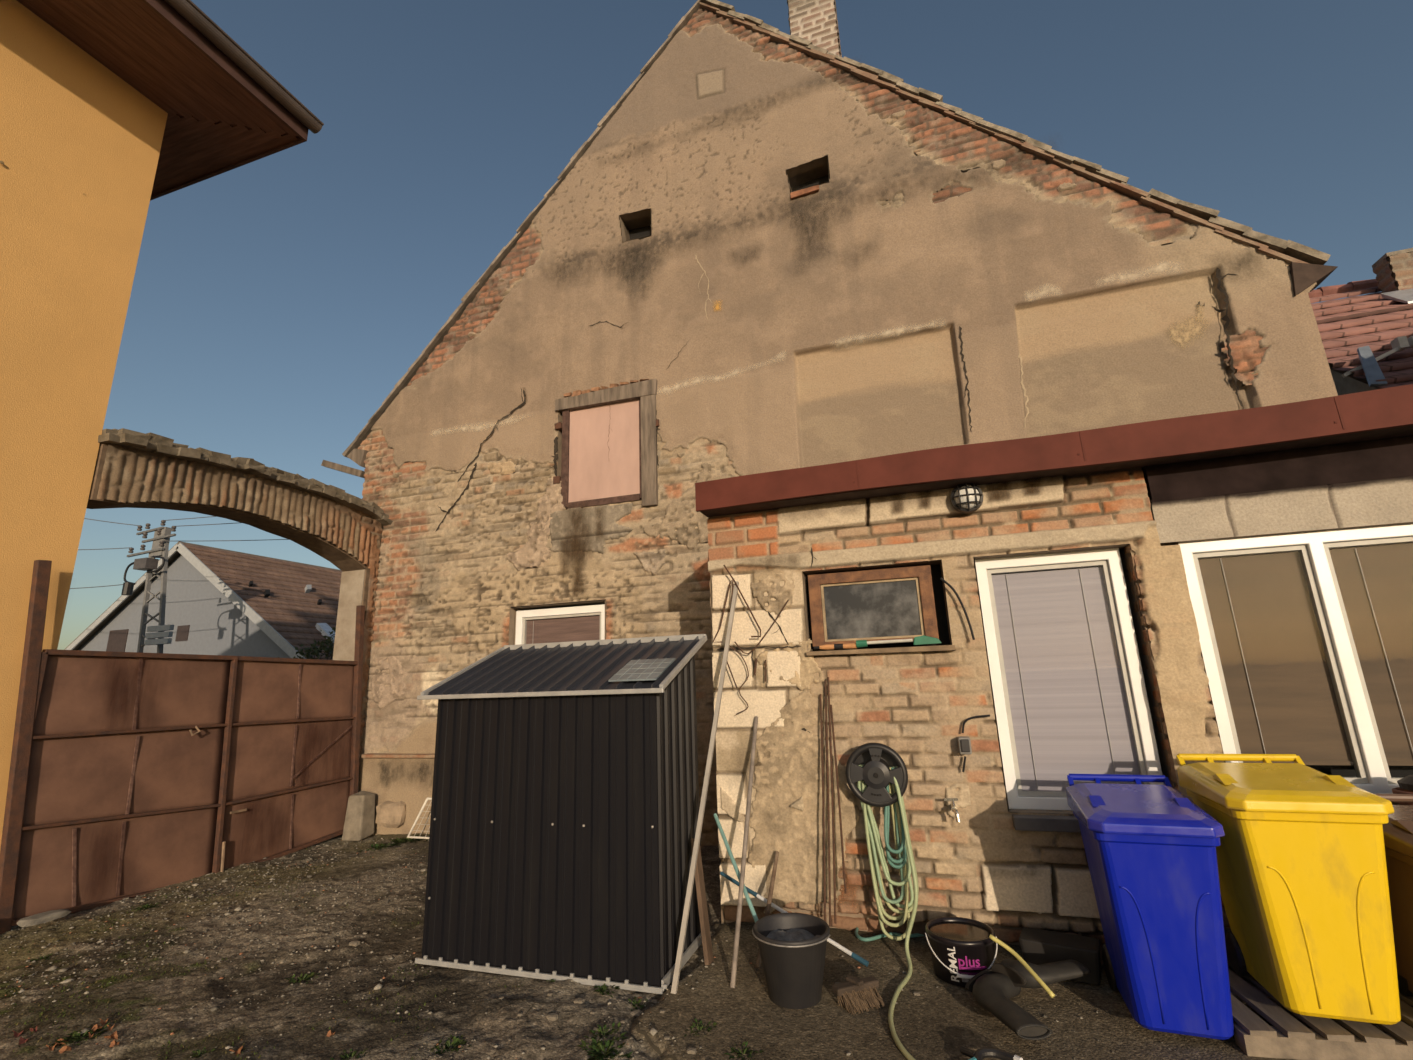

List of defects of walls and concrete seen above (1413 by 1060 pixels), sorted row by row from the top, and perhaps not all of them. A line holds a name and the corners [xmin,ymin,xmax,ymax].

flaking render [681,6,1198,246]
flaking render [407,223,543,386]
crack [1196,268,1244,409]
flaking render [1221,329,1269,385]
crack [435,389,526,532]
flaking render [358,429,861,914]